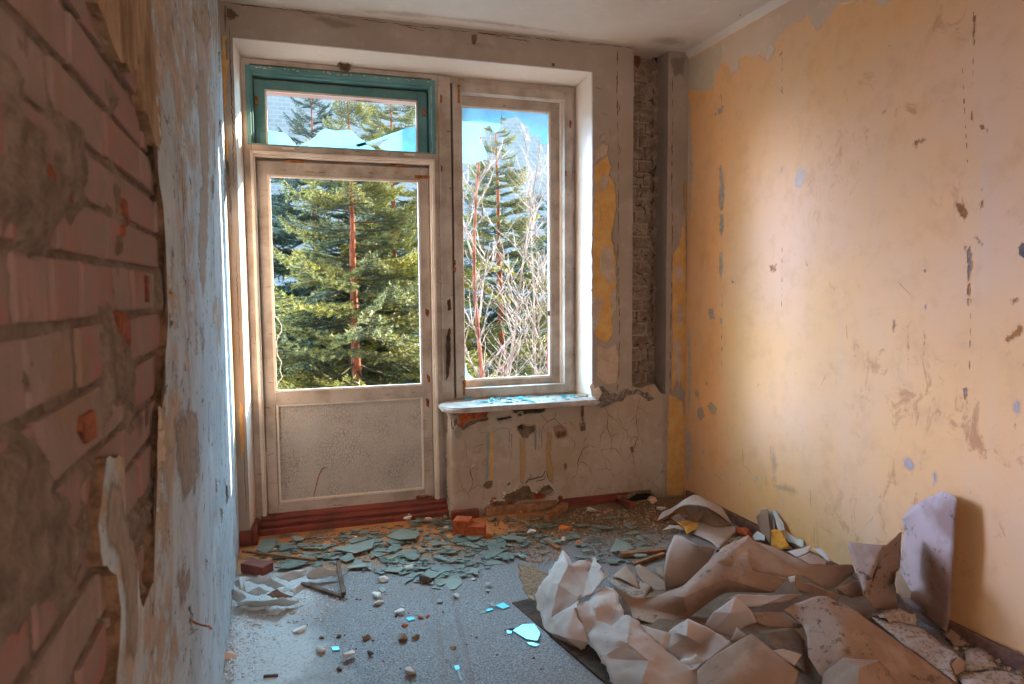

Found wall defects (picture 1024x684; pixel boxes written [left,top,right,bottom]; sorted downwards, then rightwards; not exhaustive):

spalling [0,0,179,684]
crack [218,3,673,487]
spalling [443,408,564,506]
flaking render [579,58,659,432]
peeling [622,0,893,501]